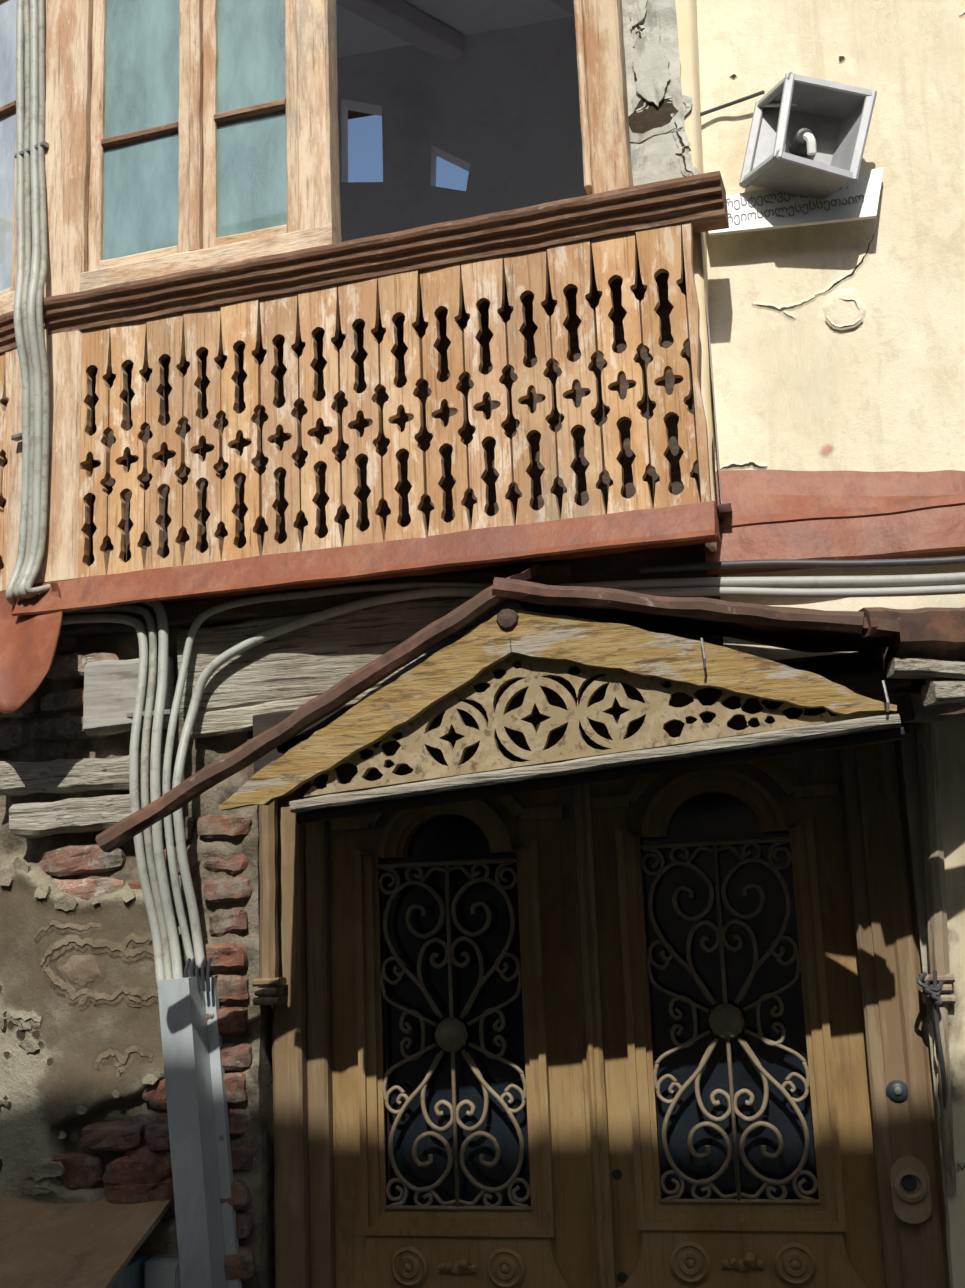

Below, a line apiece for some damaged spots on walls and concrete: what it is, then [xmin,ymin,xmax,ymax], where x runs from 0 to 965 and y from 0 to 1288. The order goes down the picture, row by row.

peeling [622,0,701,186]
crack [751,229,878,321]
spalling [0,637,122,761]
spalling [0,843,142,911]
spalling [0,1009,46,1059]
spalling [163,815,262,1288]
spalling [20,1074,176,1220]